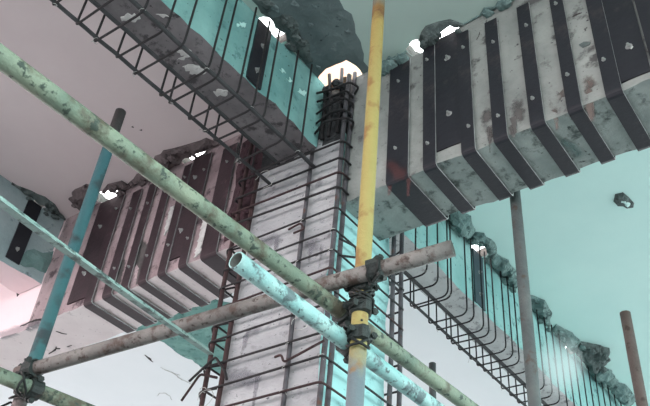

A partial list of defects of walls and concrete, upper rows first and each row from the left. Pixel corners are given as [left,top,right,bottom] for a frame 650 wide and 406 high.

spalling [252,0,368,78]
spalling [418,0,512,50]
spalling [322,79,351,141]
spalling [154,138,219,170]
spalling [68,184,89,211]
spalling [96,173,150,202]
spalling [614,192,634,209]
spalling [448,211,517,293]
spalling [531,295,636,406]